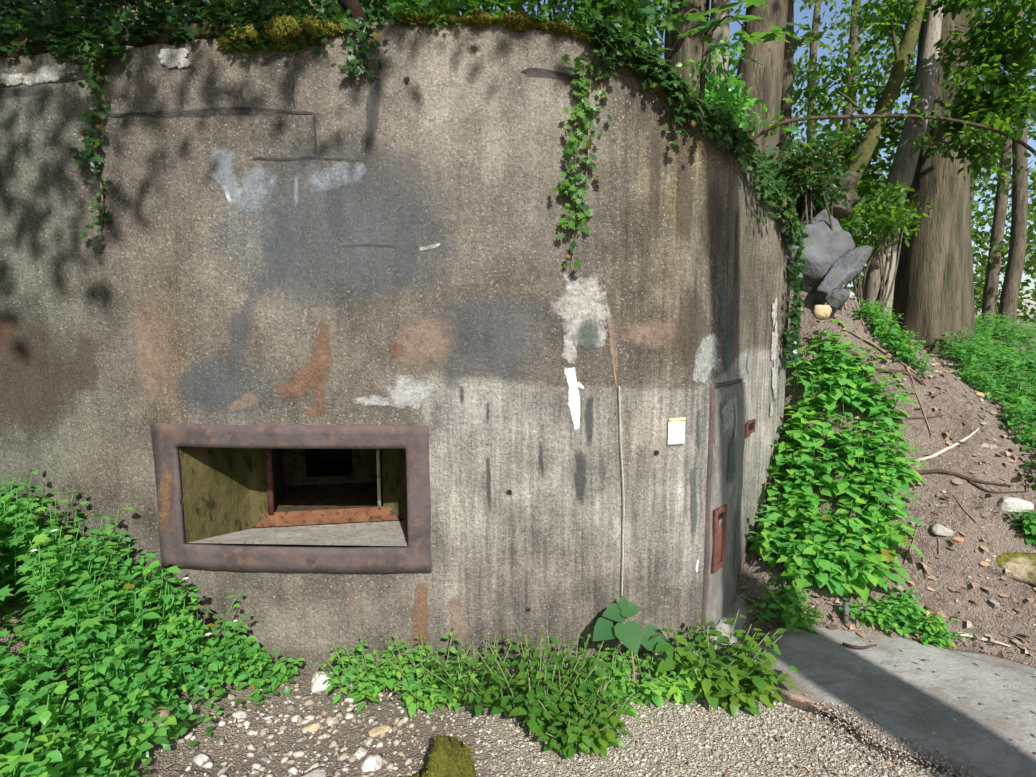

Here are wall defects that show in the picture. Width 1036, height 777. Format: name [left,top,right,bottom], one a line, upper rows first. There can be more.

crack [109,71,381,163]
rust [279,330,331,416]
damp [551,275,611,441]
damp [575,453,586,502]
damp [690,471,698,535]